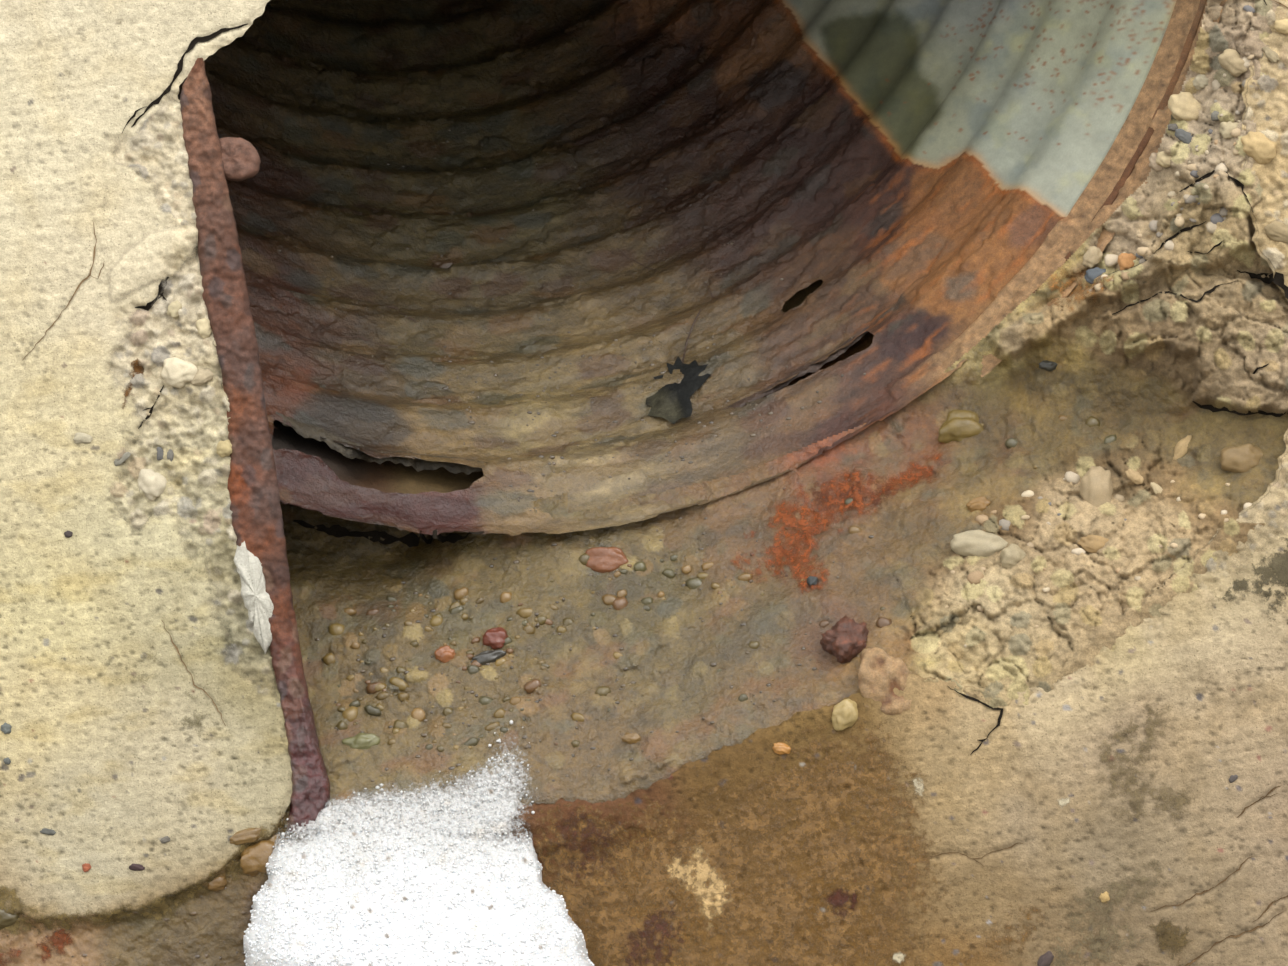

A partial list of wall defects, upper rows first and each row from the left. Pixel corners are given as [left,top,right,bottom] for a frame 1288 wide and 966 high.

crack [122,24,248,133]
spalling [114,91,197,226]
crack [1179,170,1253,212]
spalling [1168,0,1288,287]
corrosion [204,0,1227,592]
crack [1112,221,1288,315]
spalling [73,432,93,444]
spalling [109,251,276,695]
crack [1192,401,1286,417]
spalling [1206,435,1288,569]
water stain [1223,538,1288,624]
water stain [667,846,733,927]